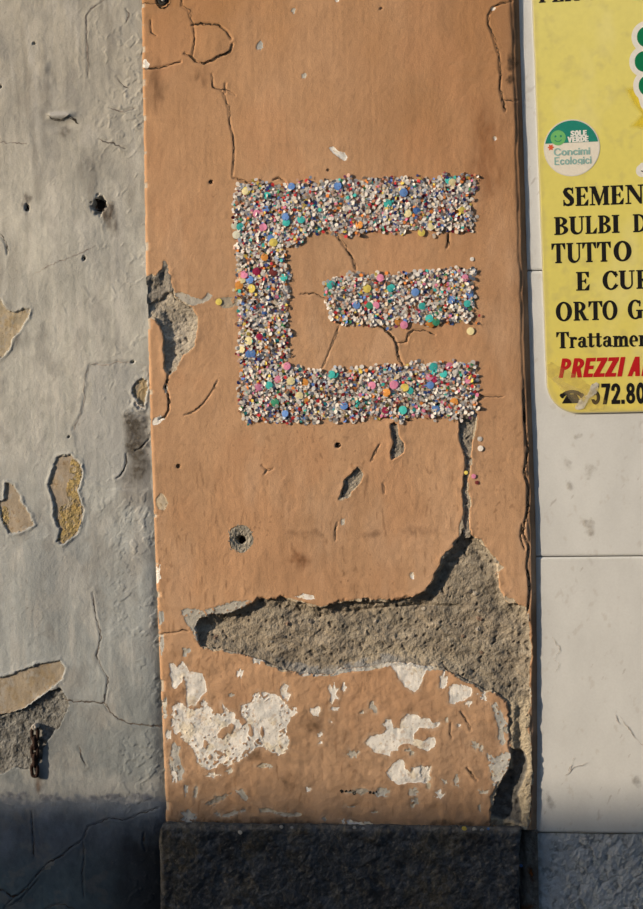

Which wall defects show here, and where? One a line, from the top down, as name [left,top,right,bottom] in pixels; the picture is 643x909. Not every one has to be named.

crack [144,0,251,184]
crack [487,2,517,111]
peeling [0,300,30,358]
peeling [132,378,148,409]
flaking render [146,261,238,394]
crack [379,324,435,365]
peeling [0,483,33,533]
peeling [49,455,84,544]
crack [64,593,163,727]
flaking render [162,410,534,830]
flaking render [0,661,69,774]
crack [0,808,155,909]